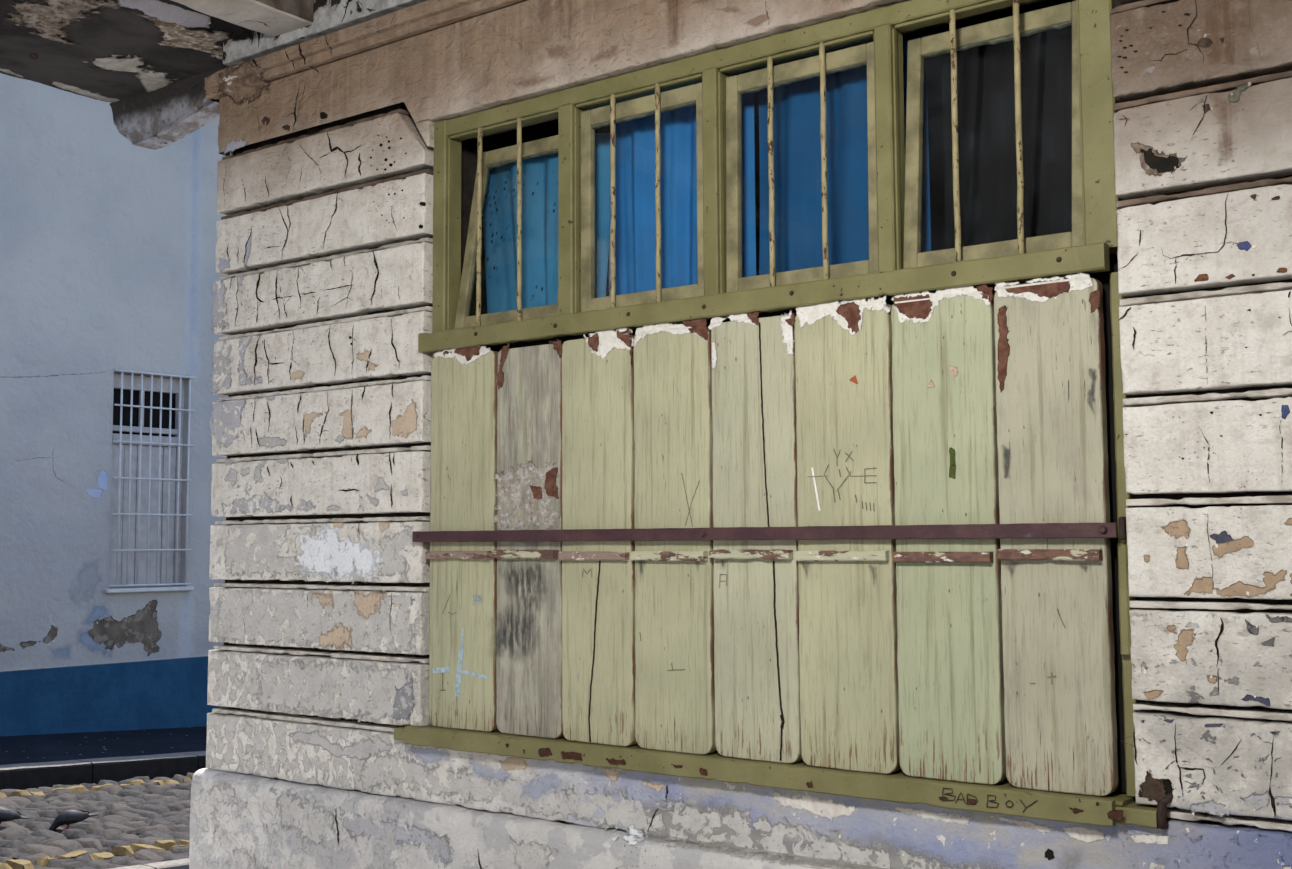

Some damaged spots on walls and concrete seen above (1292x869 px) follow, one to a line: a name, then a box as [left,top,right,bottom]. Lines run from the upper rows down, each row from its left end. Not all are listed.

flaking render [4,0,271,106]
crack [1155,0,1209,64]
crack [1190,95,1207,134]
crack [223,0,403,507]
crack [1120,193,1238,283]
crack [1118,307,1137,348]
peeling [209,232,993,869]
peeling [1161,515,1292,598]
peeling [88,600,161,657]
peeling [1166,624,1196,662]
peeling [1245,614,1292,646]
peeling [1242,694,1270,706]